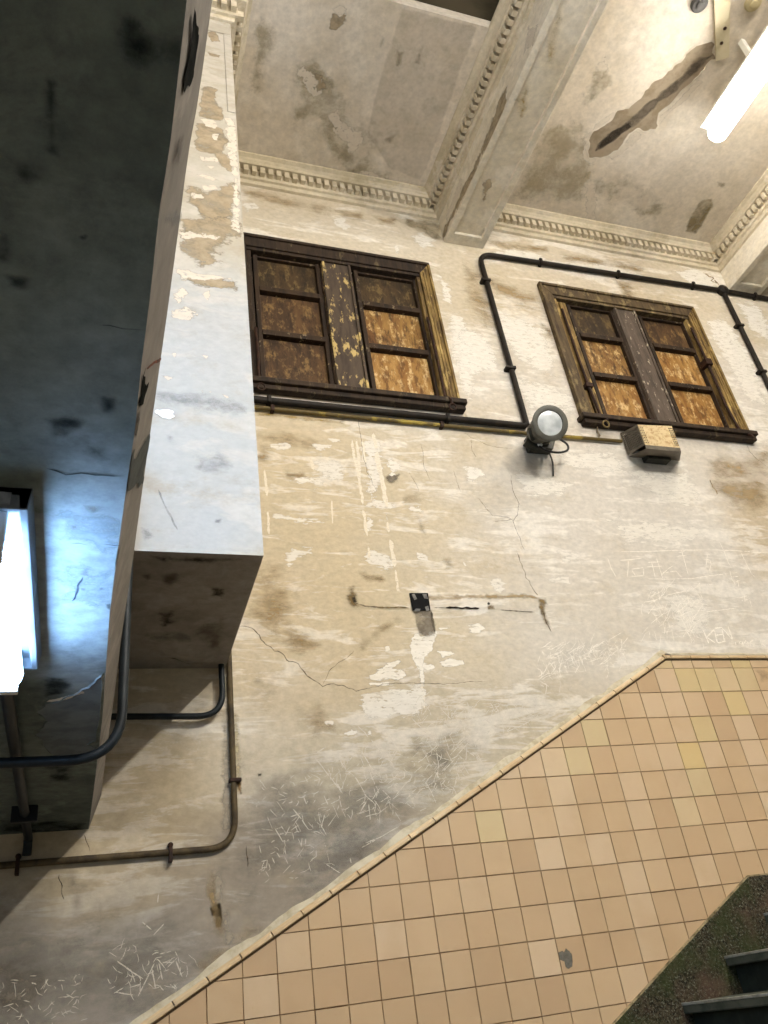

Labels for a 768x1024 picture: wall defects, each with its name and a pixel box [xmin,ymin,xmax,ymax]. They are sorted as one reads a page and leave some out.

damp [297,66,326,97]
spalling [583,39,716,163]
peeling [191,118,259,233]
peeling [179,231,221,240]
peeling [411,232,437,248]
peeling [171,269,231,320]
peeling [295,438,346,489]
peeling [360,441,401,531]
peeling [363,550,395,570]
crack [454,473,551,631]
crack [245,626,481,691]
peeling [344,627,464,736]